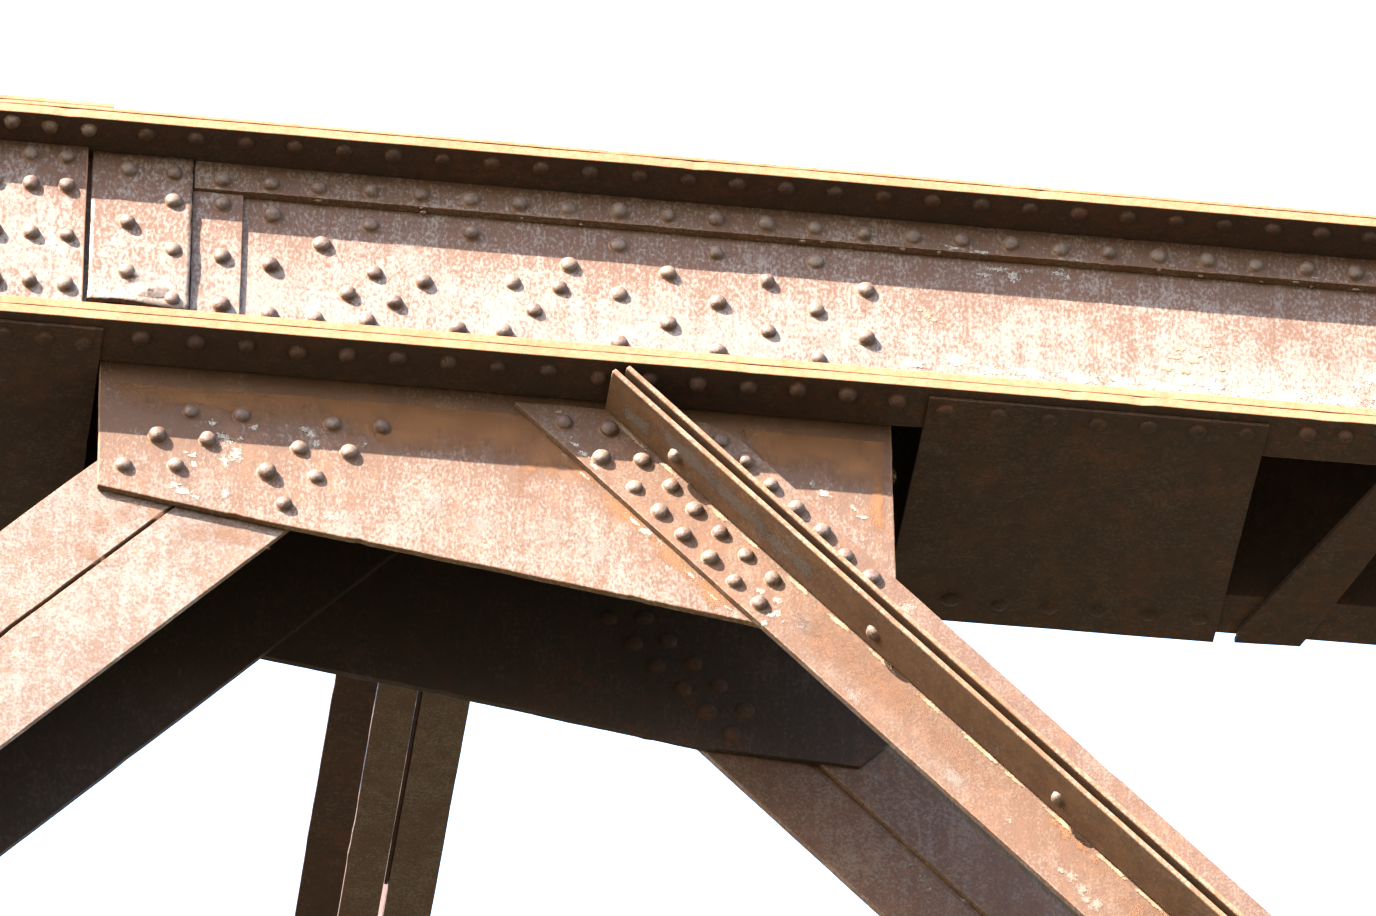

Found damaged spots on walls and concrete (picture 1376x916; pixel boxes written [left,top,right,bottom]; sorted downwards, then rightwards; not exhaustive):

peeling [208,419,258,466]
rust [562,453,594,479]
rust [616,422,677,478]
rust [743,430,886,527]
rust [606,494,645,529]
rust [658,542,731,607]
rust [961,731,1023,787]
rust [1038,801,1162,911]